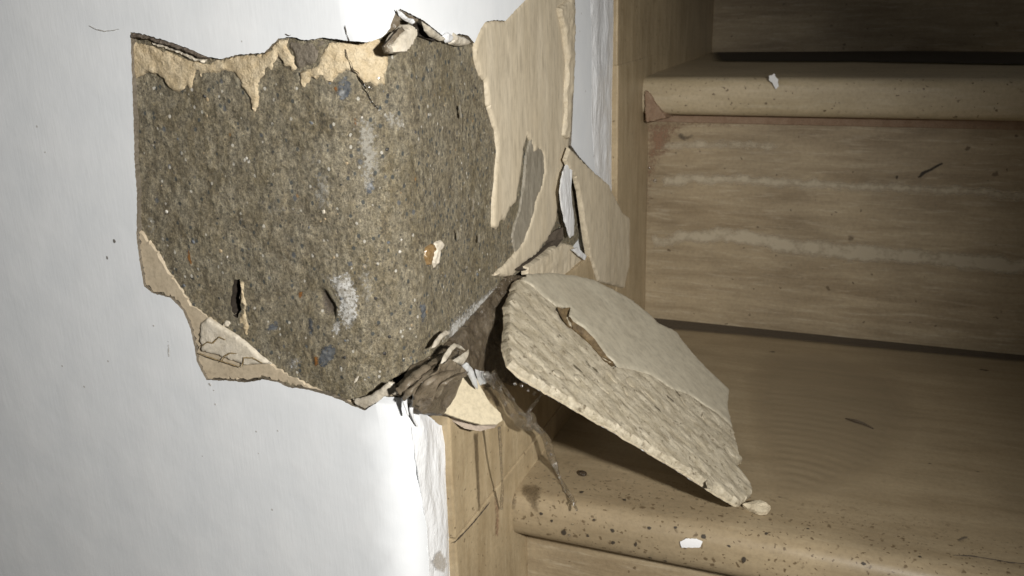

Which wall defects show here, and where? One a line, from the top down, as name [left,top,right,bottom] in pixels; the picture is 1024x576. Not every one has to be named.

spalling [133,0,586,409]
crack [345,27,380,111]